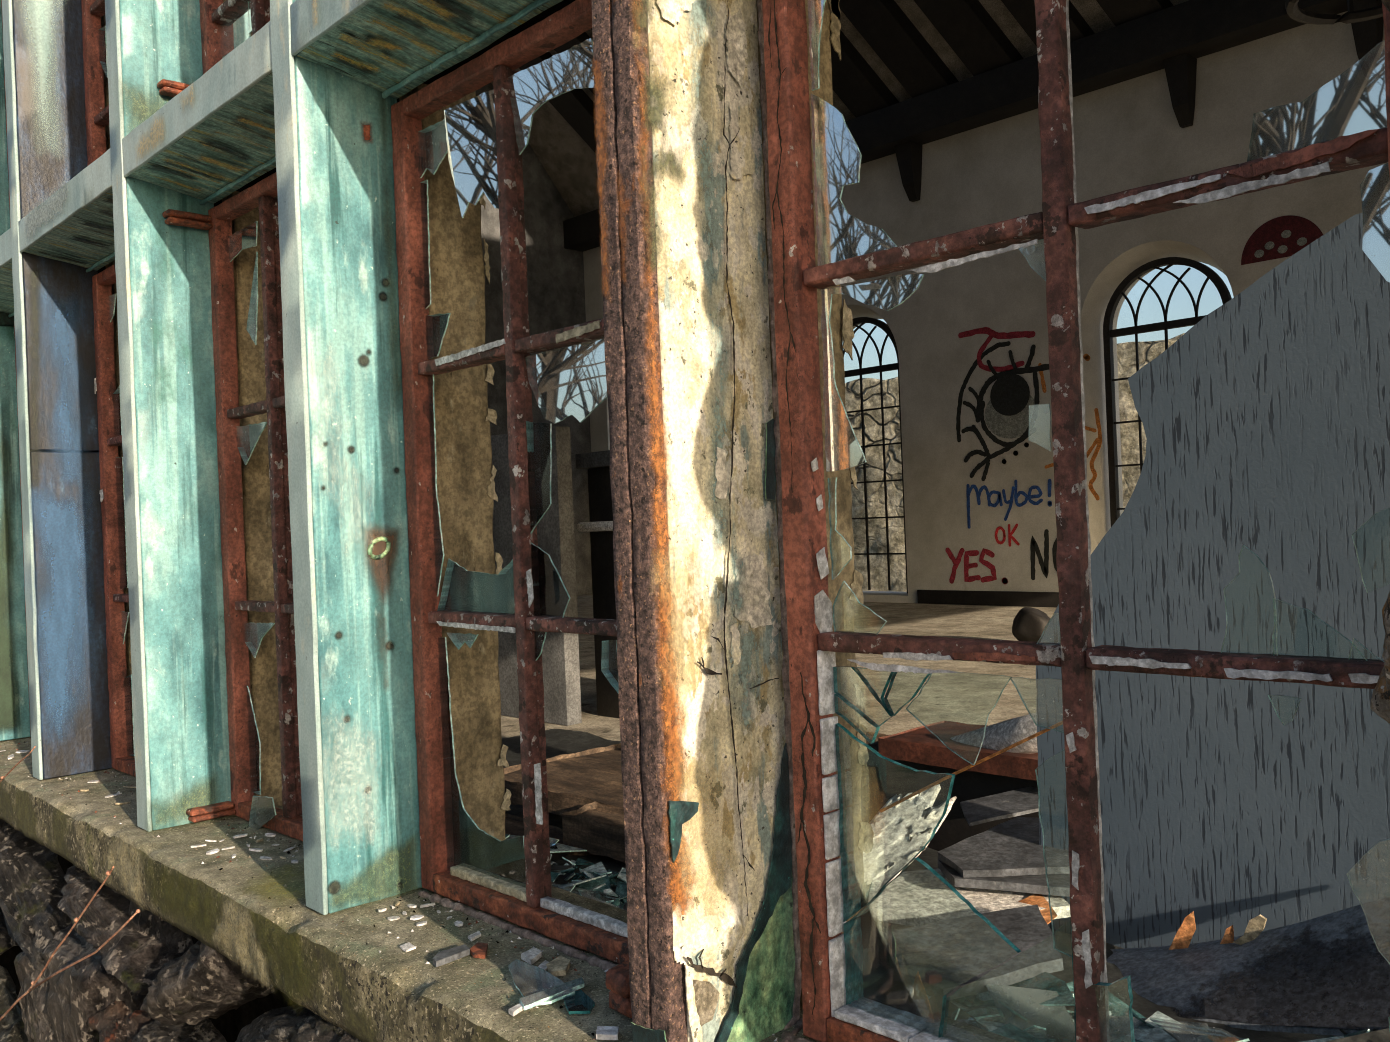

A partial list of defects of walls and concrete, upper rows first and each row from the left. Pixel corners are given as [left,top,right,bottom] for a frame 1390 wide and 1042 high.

peeling [656,0,695,26]
peeling [725,7,754,181]
rust [594,61,626,295]
damp [379,273,393,301]
damp [359,349,371,366]
rust [646,252,686,825]
crack [697,0,821,1015]
damp [328,839,415,906]
rust [669,832,696,917]
spalling [685,965,732,1042]